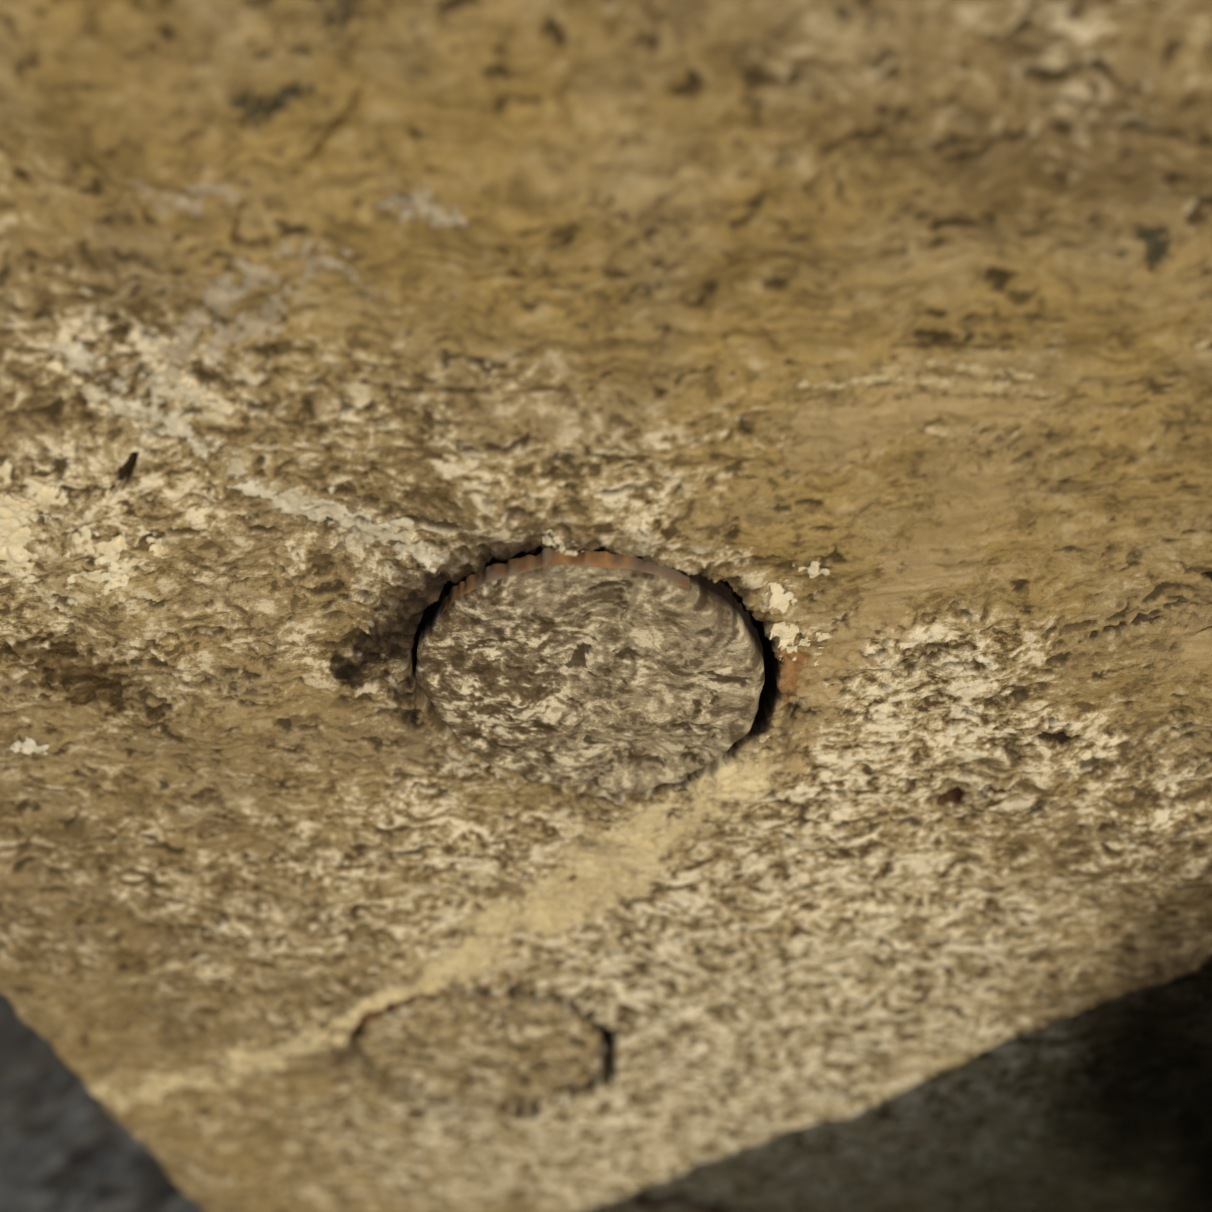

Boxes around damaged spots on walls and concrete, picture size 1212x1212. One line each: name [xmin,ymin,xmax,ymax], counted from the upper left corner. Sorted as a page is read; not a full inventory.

peeling [83,365,1054,1115]
rust [777,644,816,705]
water stain [1091,958,1212,1212]